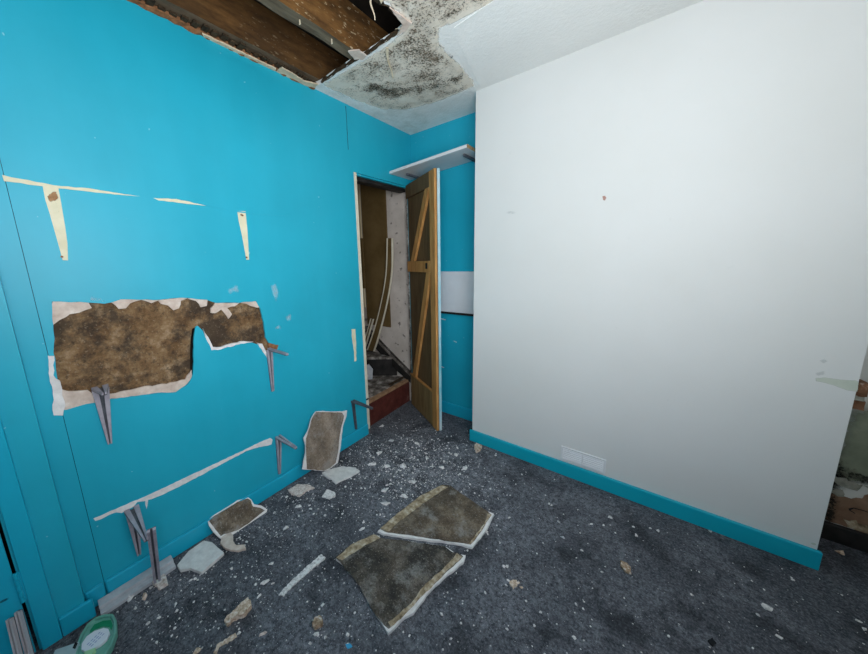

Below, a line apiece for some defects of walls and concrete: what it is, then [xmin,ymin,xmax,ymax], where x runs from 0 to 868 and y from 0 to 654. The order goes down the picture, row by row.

flaking render [127,0,318,90]
flaking render [348,49,367,60]
flaking render [380,0,412,36]
leakage [342,0,482,107]
peeling [2,175,134,196]
peeling [155,198,288,216]
flaking render [48,298,278,415]
peeling [93,438,272,521]
leakage [824,410,868,522]